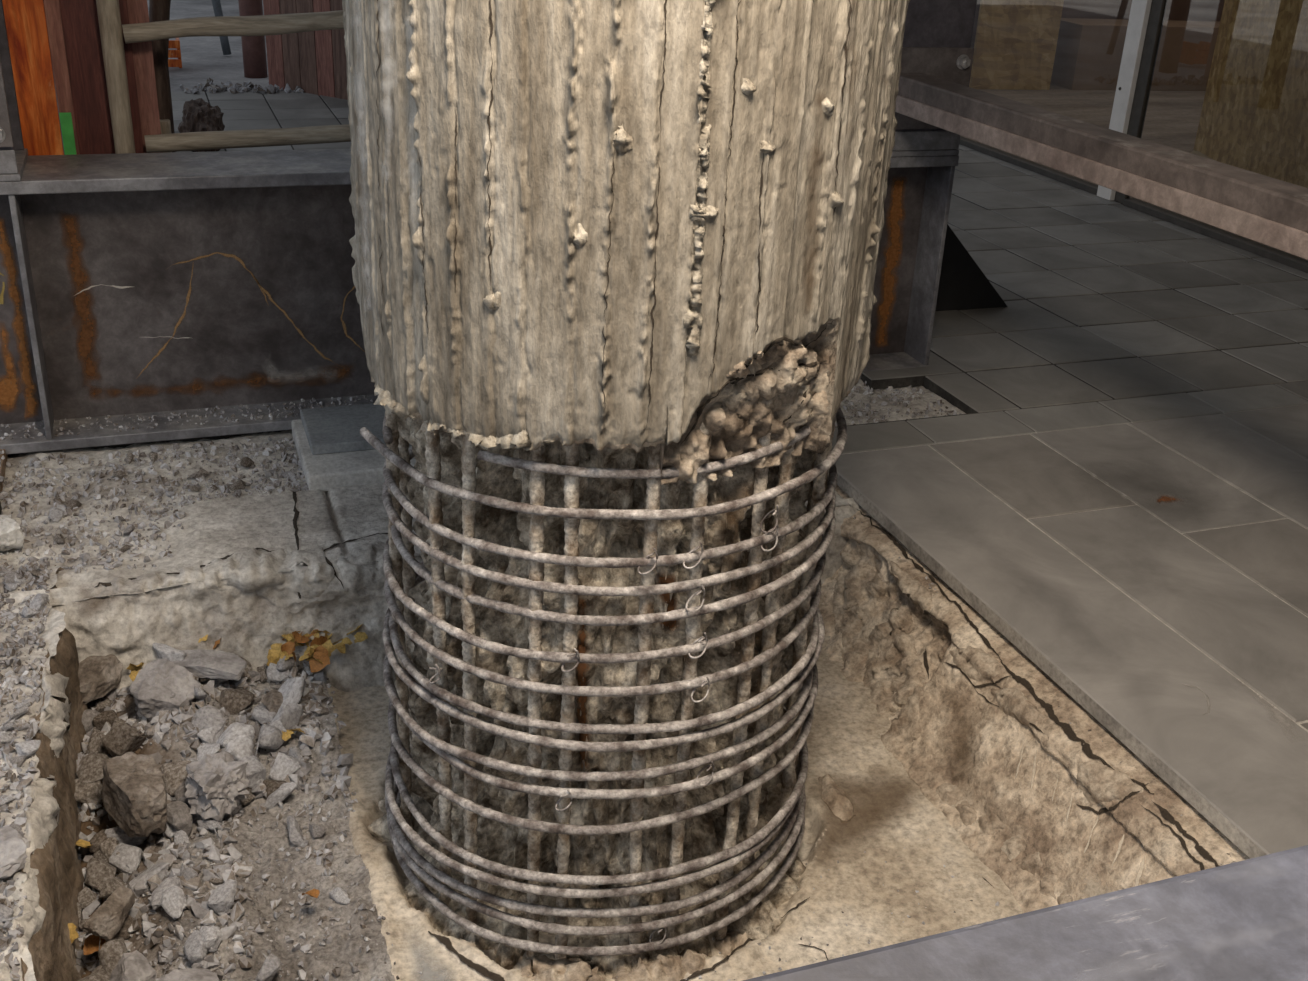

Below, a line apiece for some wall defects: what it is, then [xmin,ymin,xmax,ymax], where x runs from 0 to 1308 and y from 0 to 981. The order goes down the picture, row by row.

rust [0,220,38,417]
rust [62,215,100,379]
rust [139,252,340,375]
spalling [374,383,567,451]
spalling [697,344,832,440]
crack [857,509,1219,870]
spalling [469,933,499,955]
spalling [518,930,748,981]